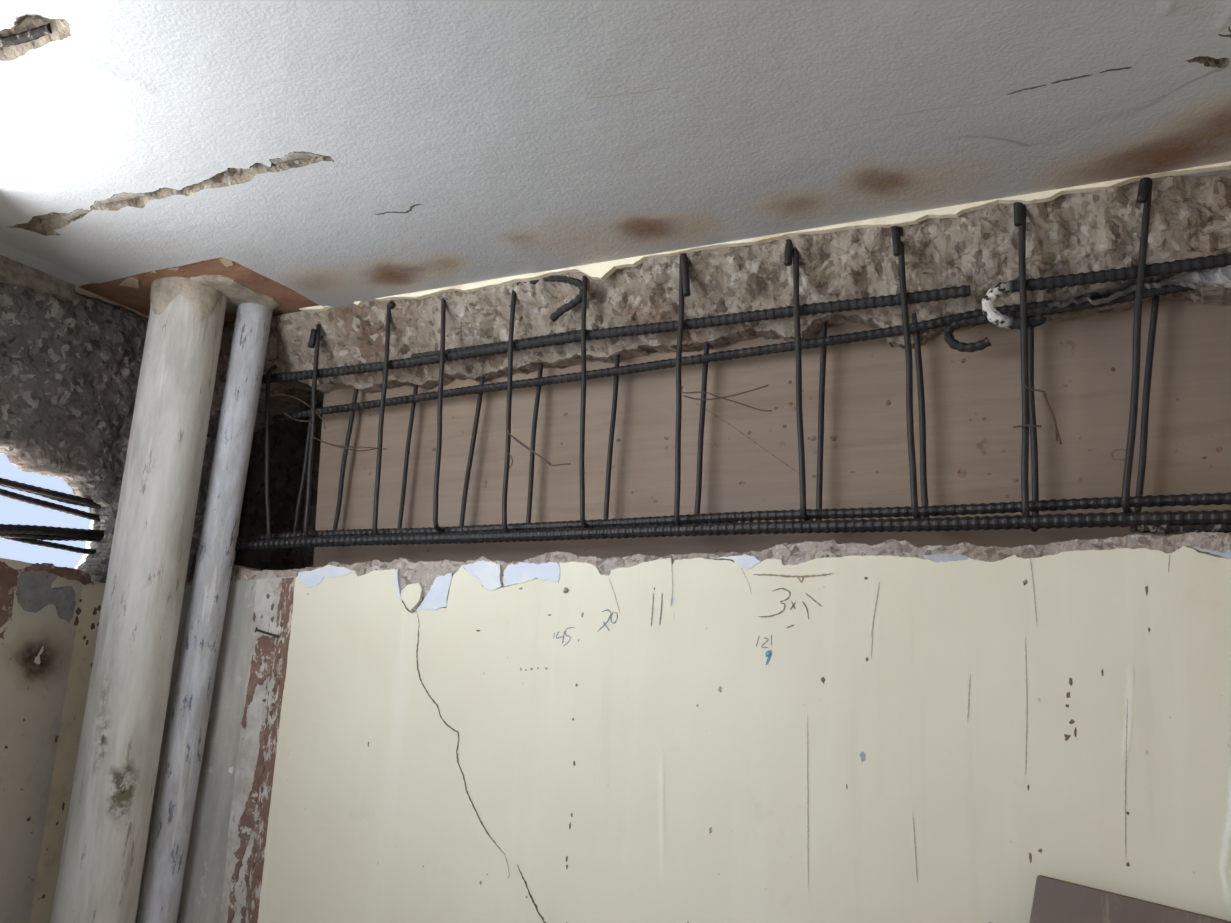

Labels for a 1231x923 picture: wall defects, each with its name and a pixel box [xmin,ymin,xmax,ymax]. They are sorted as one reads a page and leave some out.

flaking render [0,14,72,61]
flaking render [8,151,334,236]
rust [265,62,1231,306]
spalling [1023,173,1231,328]
flaking render [1186,56,1230,68]
spalling [0,203,1020,923]
crack [401,596,547,923]
flaking render [177,492,1231,923]